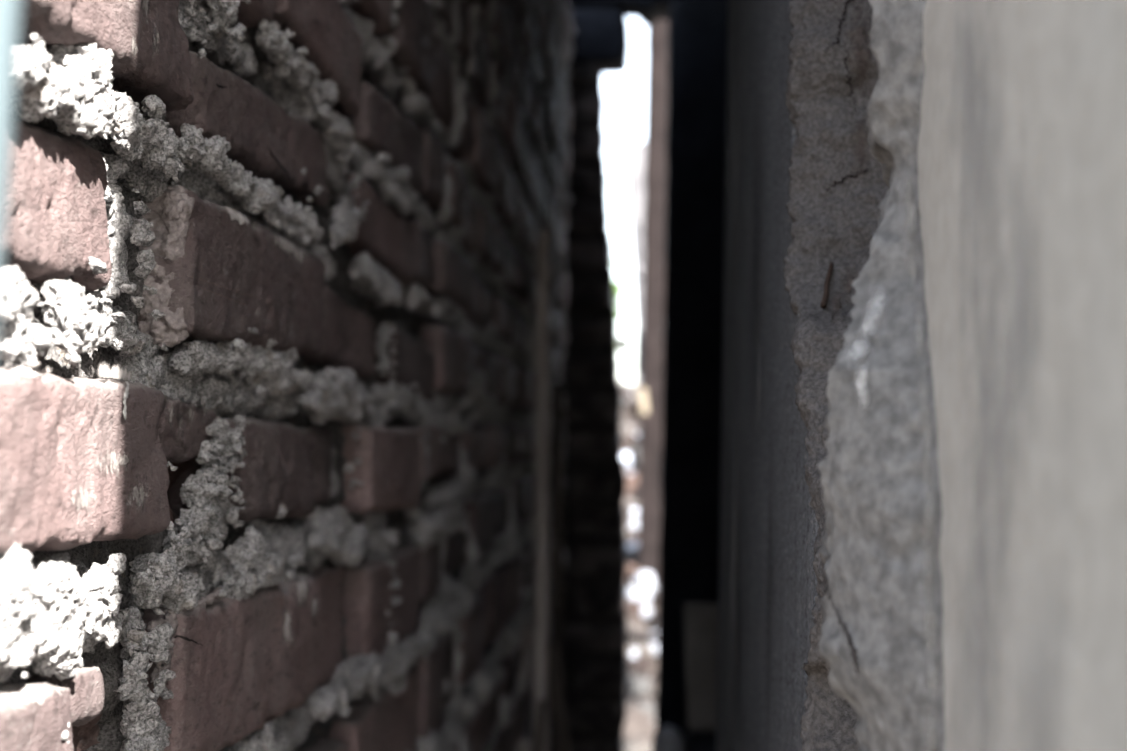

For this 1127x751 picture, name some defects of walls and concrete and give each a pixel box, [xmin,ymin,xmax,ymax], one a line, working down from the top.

crack [823,0,857,111]
crack [826,169,868,191]
spalling [783,0,945,751]